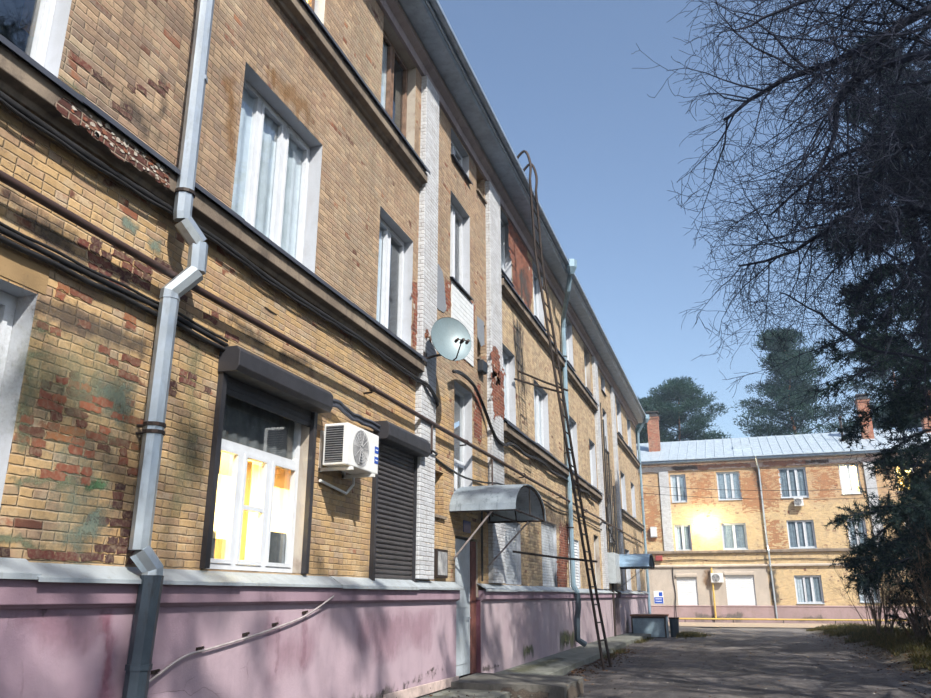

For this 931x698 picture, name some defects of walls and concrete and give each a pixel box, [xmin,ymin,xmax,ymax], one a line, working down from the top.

peeling [70,50,133,121]
peeling [127,79,169,98]
flaking render [55,97,170,188]
peeling [507,219,533,311]
flaking render [473,346,506,444]